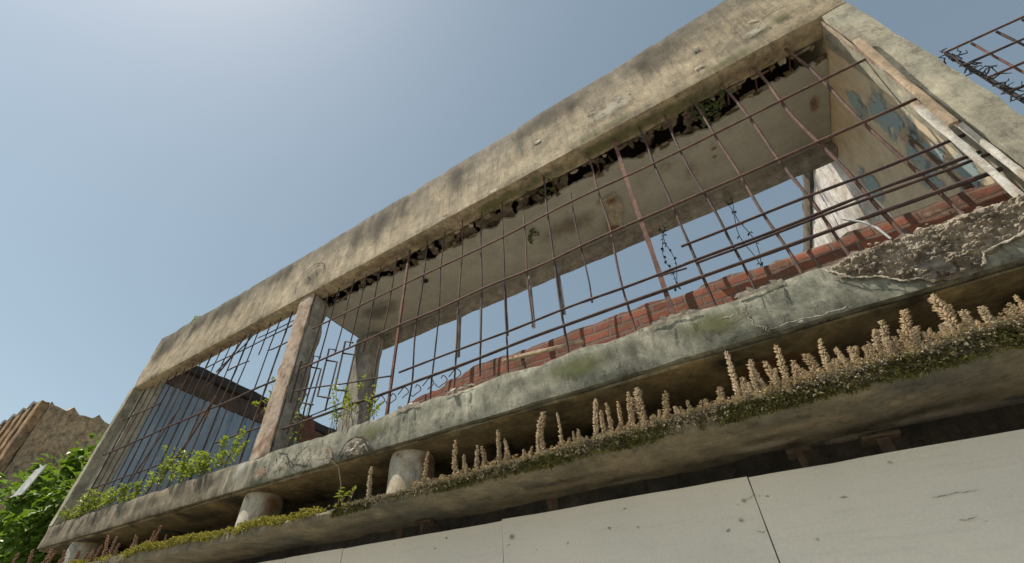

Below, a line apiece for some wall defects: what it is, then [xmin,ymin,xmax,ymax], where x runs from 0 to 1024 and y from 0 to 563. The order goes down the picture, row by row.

spalling [591,93,631,118]
peeling [847,88,981,191]
spalling [822,194,1024,283]